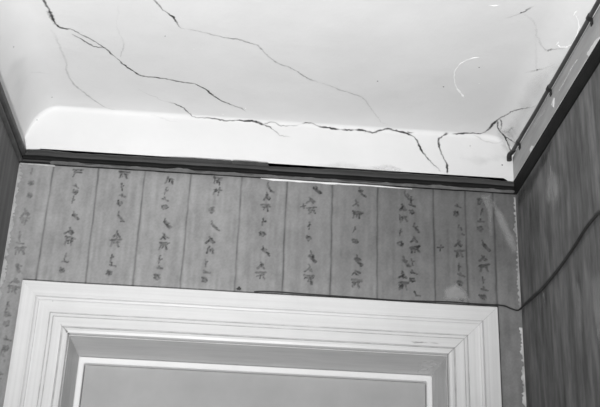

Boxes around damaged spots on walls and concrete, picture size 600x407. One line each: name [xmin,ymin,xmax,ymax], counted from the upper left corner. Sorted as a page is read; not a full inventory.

crack [43,0,231,105]
crack [211,118,269,127]
crack [321,109,519,172]